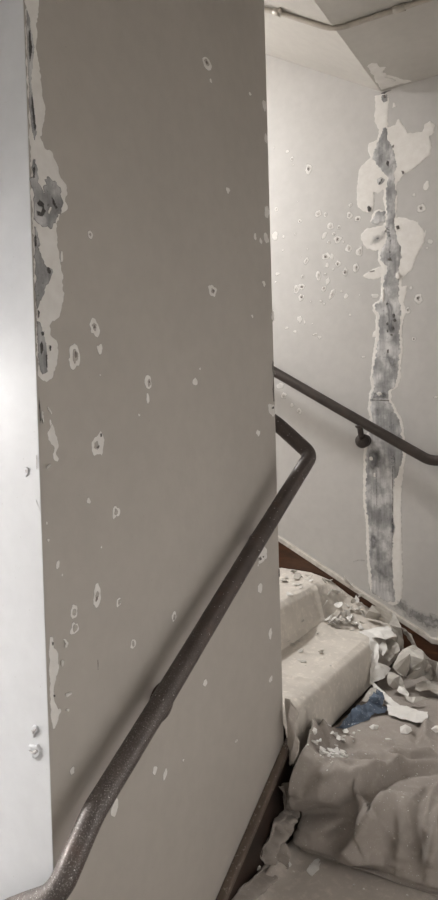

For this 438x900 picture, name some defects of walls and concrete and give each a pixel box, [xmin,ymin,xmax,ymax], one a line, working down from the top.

peeling [24,0,80,382]
peeling [89,318,103,355]
peeling [315,63,438,734]
peeling [36,407,59,469]
peeling [91,431,104,456]
peeling [93,583,101,608]
peeling [49,604,79,729]